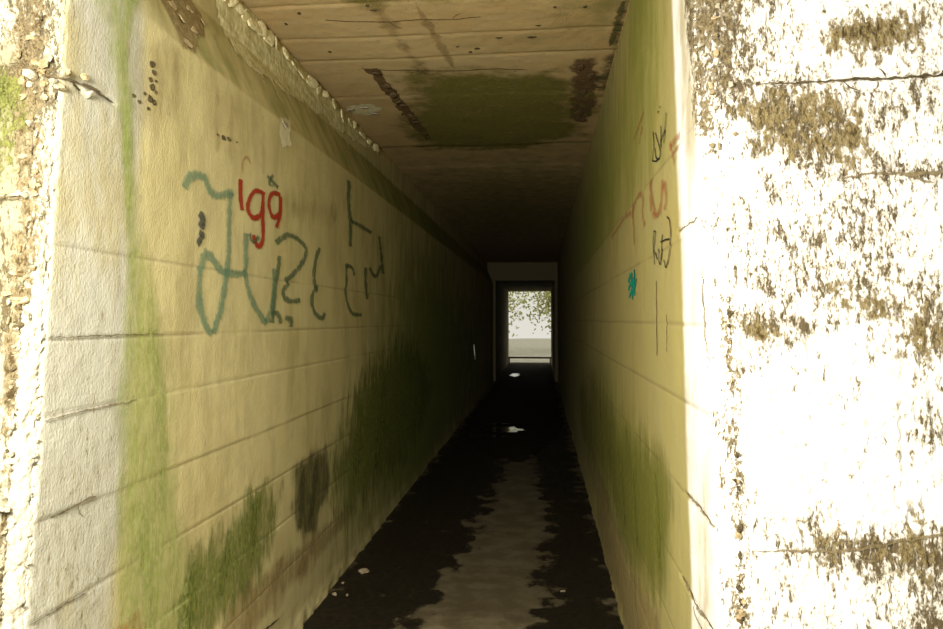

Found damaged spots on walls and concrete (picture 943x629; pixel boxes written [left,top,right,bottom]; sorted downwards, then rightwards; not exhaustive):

spalling [364,68,431,140]
spalling [569,58,600,122]
spalling [684,0,741,153]
crack [762,68,943,92]
crack [0,192,19,200]
leakage [295,452,329,554]
leakage [303,362,624,629]